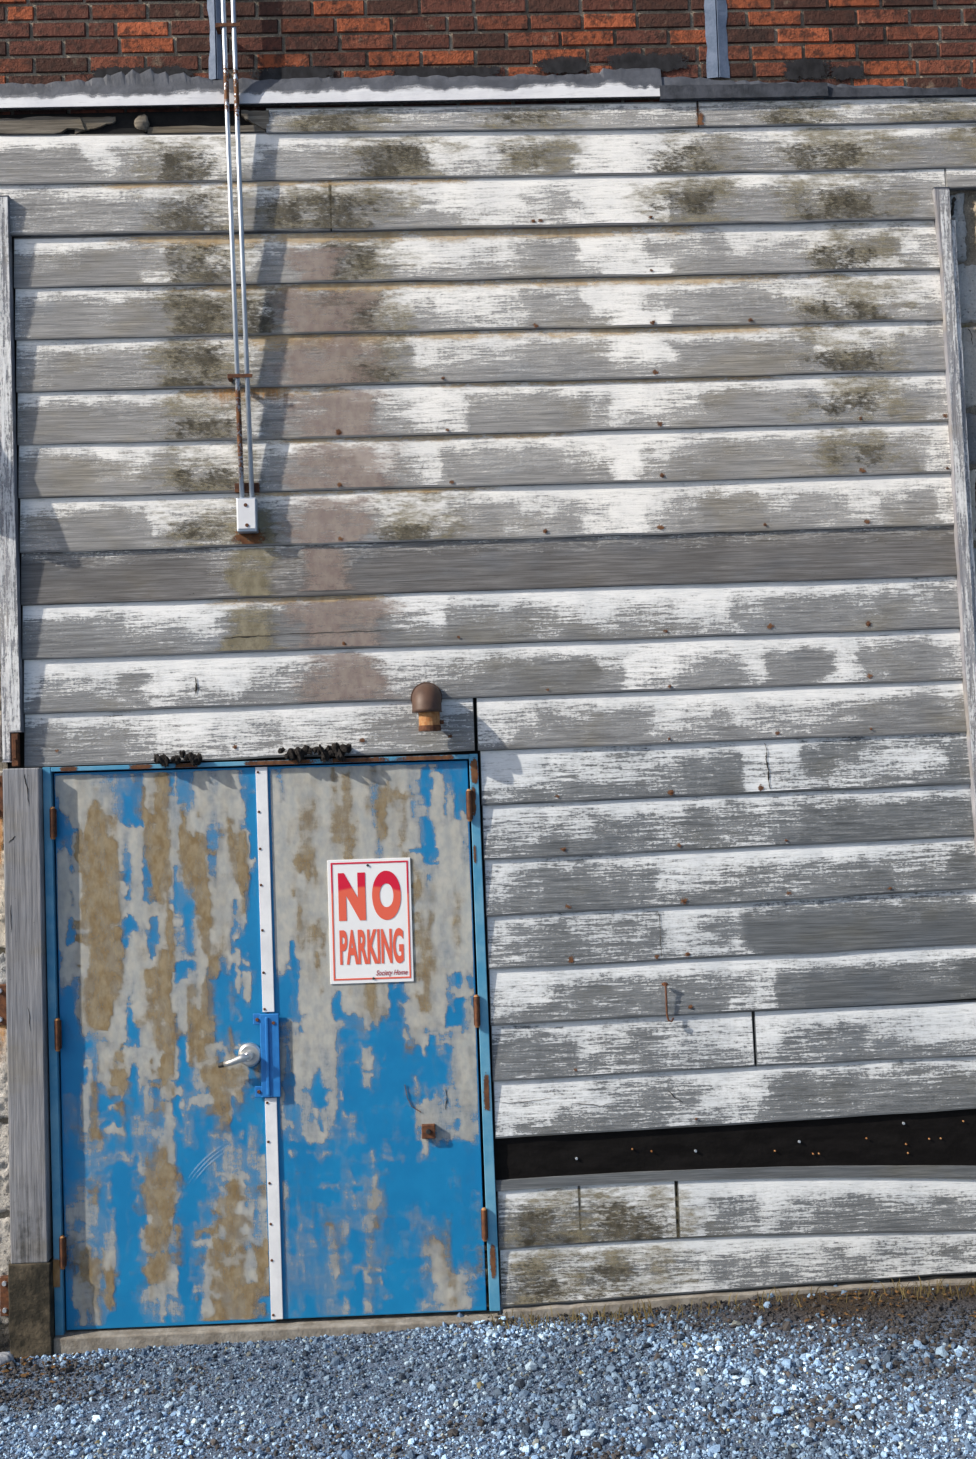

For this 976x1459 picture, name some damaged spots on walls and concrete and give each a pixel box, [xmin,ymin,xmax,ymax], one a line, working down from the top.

rust [219,247,394,702]
water stain [98,106,779,651]
peeling [0,83,976,1157]
water stain [759,99,976,472]
peeling [55,770,256,1326]
peeling [193,1133,269,1321]
peeling [301,1151,383,1314]
peeling [422,1228,476,1311]
water stain [499,1187,701,1305]
peeling [498,1178,976,1305]